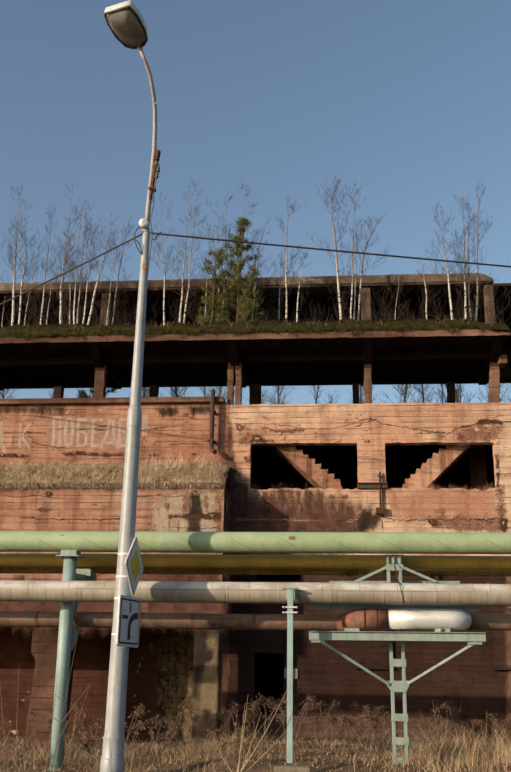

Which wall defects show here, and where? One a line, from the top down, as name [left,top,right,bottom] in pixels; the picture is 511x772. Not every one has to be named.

crack [236,418,479,439]
peeling [151,491,223,532]
damp [224,478,372,532]